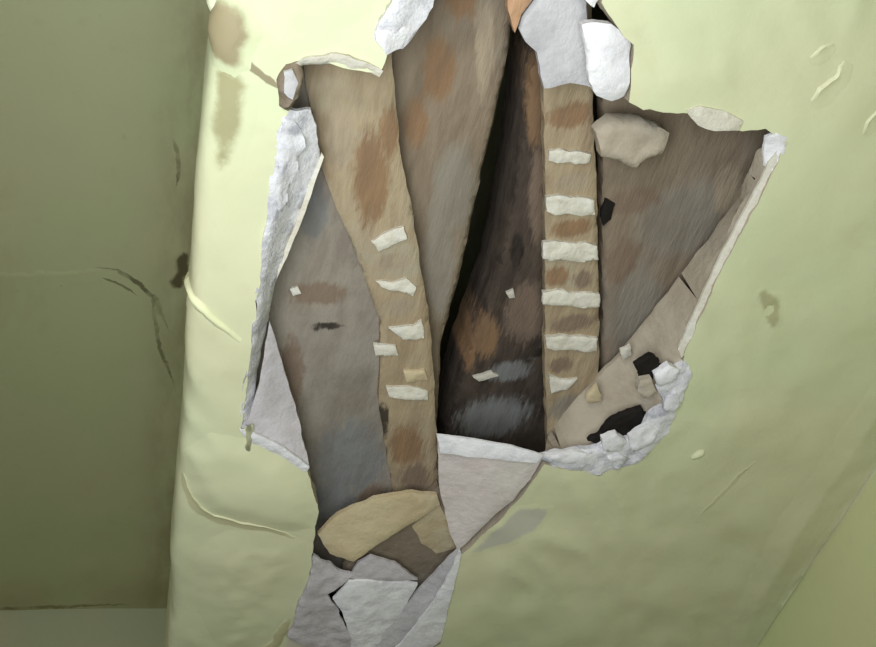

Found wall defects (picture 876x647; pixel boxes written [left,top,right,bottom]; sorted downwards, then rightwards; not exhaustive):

peeling [374,0,434,55]
spalling [579,0,634,102]
crack [172,138,182,187]
spalling [686,106,743,131]
spalling [240,52,383,429]
crack [96,266,175,388]
spalling [460,132,788,557]